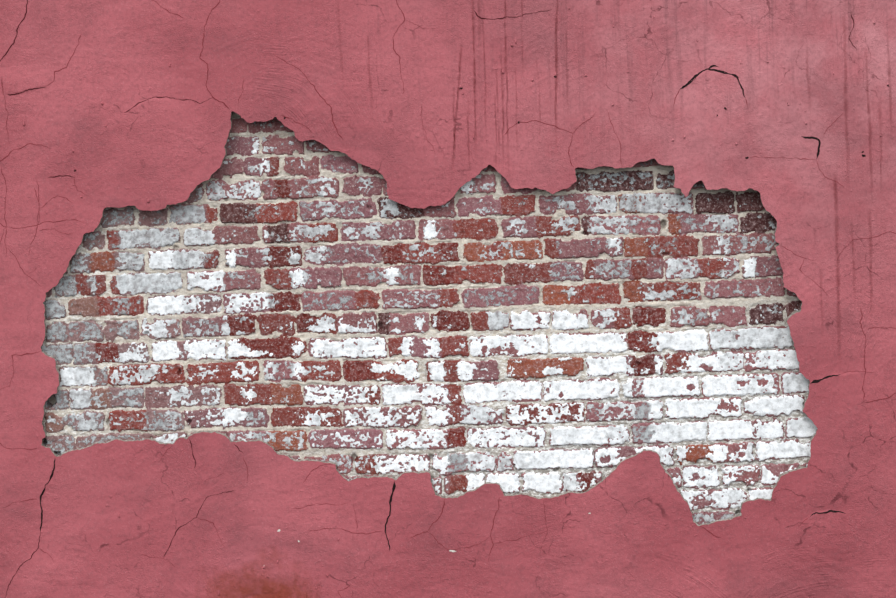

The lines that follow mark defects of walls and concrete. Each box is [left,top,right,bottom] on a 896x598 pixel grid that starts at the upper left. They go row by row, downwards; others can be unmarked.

crack [126,0,244,112]
crack [673,65,747,107]
crack [0,0,84,286]
spalling [40,111,817,526]
crack [0,443,55,598]
crack [293,481,396,550]
crack [413,497,548,561]